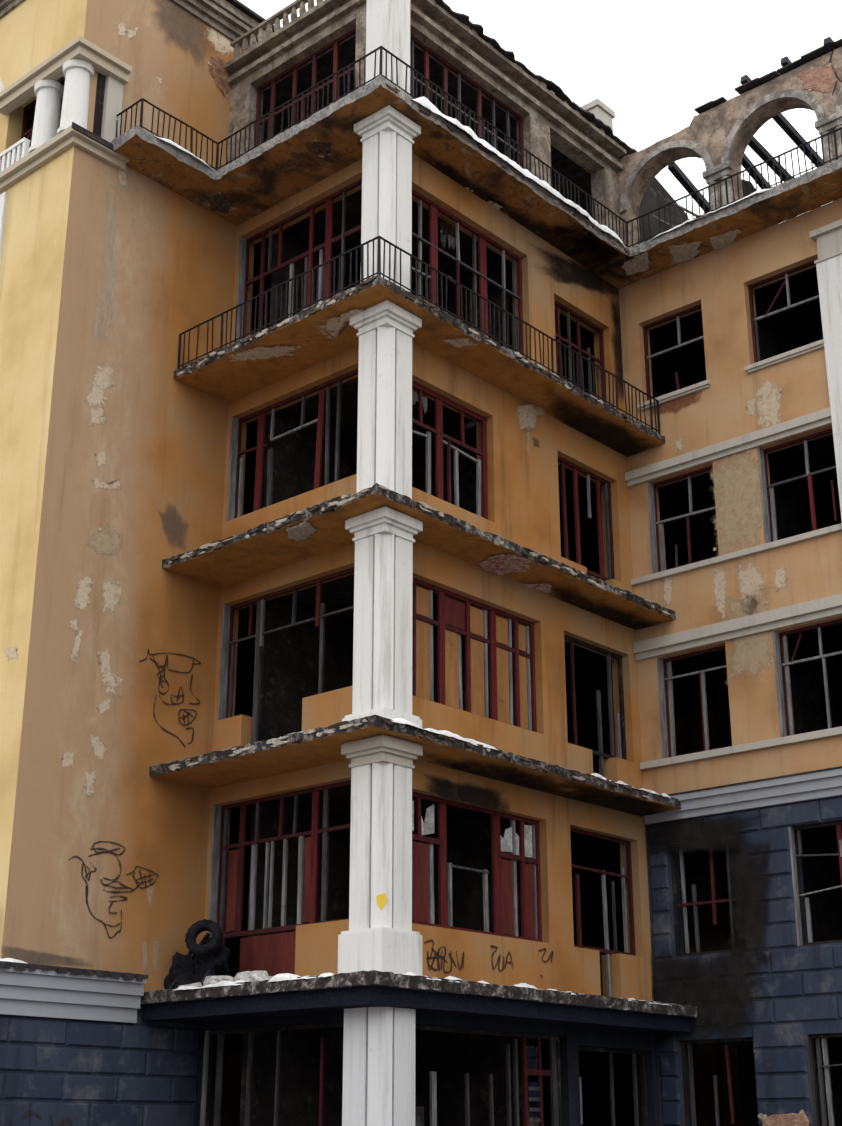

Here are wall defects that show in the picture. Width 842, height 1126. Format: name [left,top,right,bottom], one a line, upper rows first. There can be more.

peeling [176,276,378,377]
peeling [87,363,114,425]
spalling [515,352,630,423]
peeling [745,380,784,428]
damp [162,508,185,546]
spalling [409,502,464,526]
peeling [711,449,788,620]
spalling [479,541,602,593]
peeling [70,577,122,662]
peeling [95,648,123,714]
peeling [728,631,774,683]
spalling [758,1110,809,1126]